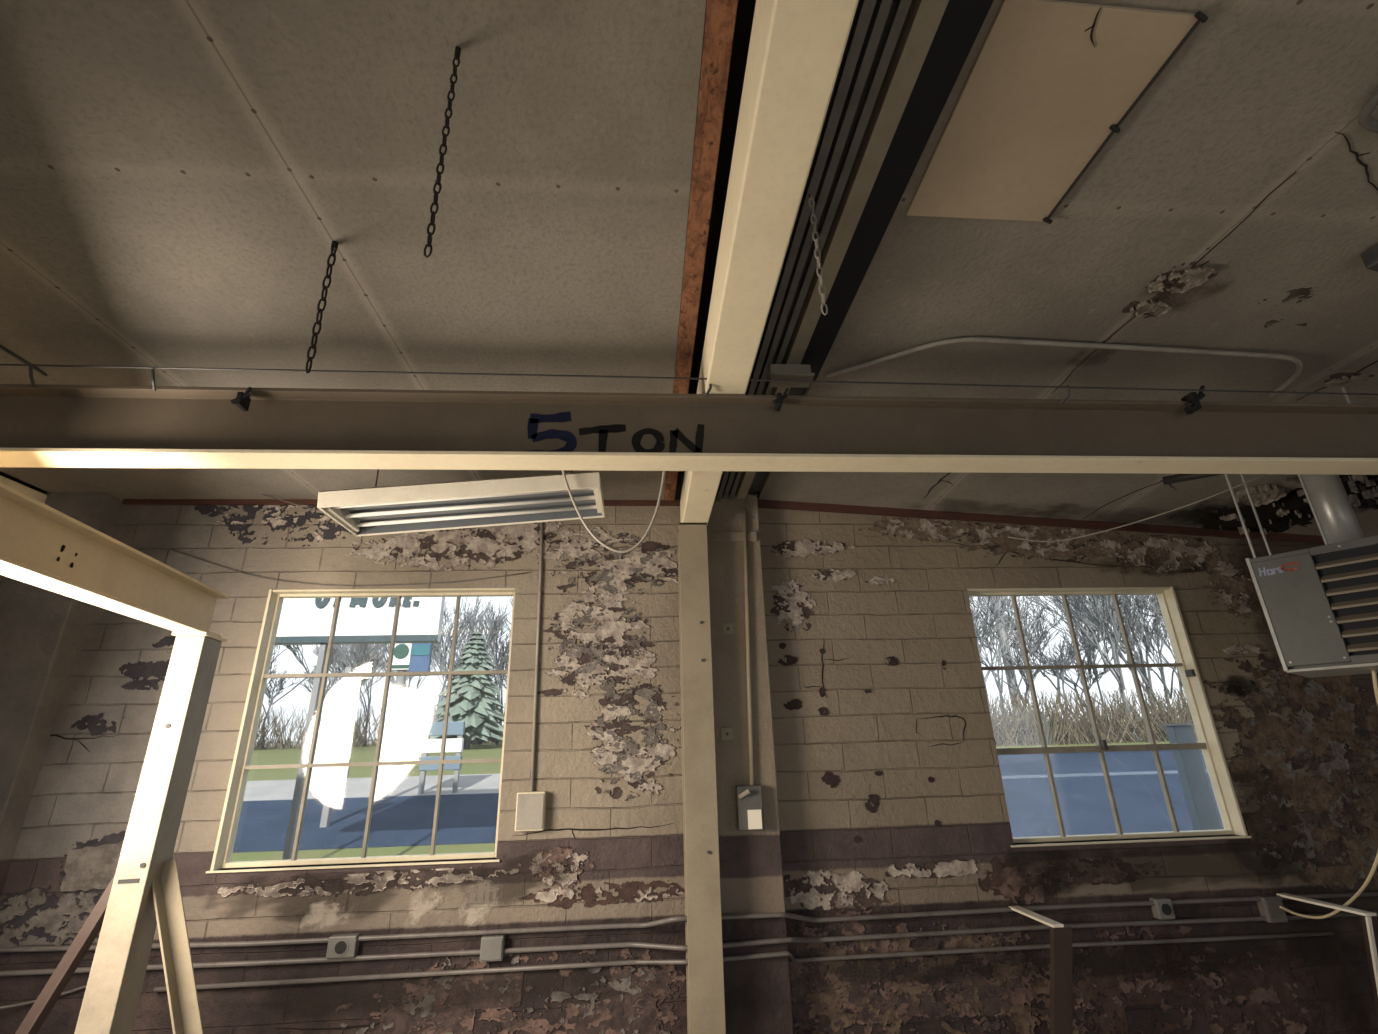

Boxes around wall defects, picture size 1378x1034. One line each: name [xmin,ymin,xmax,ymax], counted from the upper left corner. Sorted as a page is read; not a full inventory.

crack [1335,132,1378,191]
peeling [119,636,176,691]
peeling [194,505,681,801]
peeling [71,713,125,736]
peeling [783,687,829,716]
peeling [821,771,841,788]
peeling [865,794,880,813]
spalling [1203,643,1378,893]
spalling [0,831,125,956]
peeling [216,846,685,909]
flaking render [783,856,1163,1034]
flaking render [336,948,687,1034]